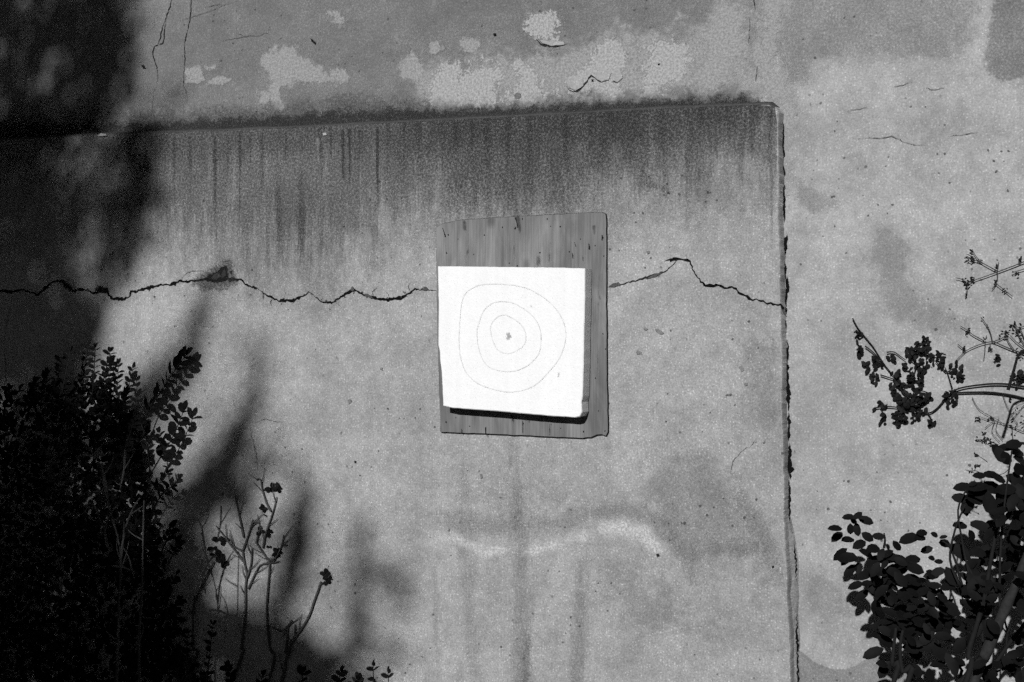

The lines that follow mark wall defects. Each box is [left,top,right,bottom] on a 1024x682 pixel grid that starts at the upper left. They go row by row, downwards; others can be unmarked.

crack [150,1,236,126]
peeling [259,45,350,111]
peeling [397,0,799,175]
crack [0,261,436,380]
crack [609,122,797,577]
crack [793,616,801,682]